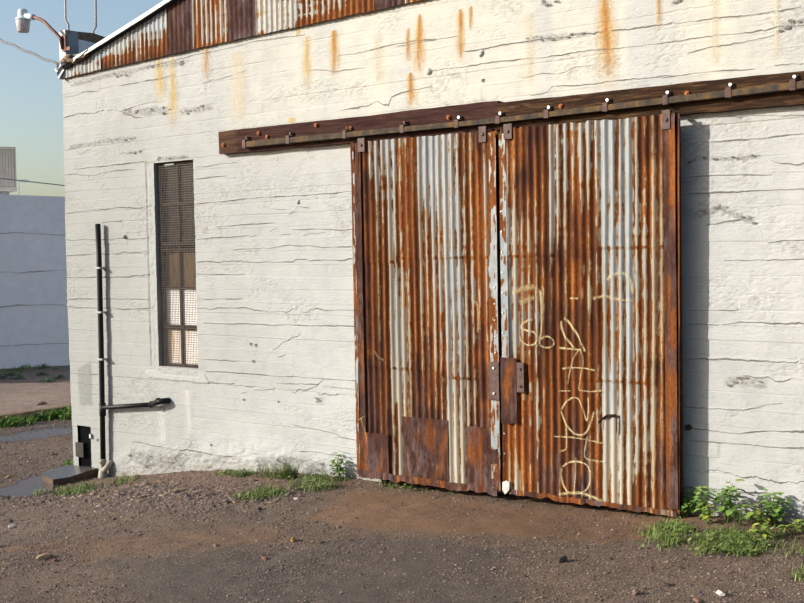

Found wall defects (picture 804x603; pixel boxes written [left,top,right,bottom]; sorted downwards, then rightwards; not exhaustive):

rust [407,15,422,59]
crack [308,5,804,111]
rust [600,0,613,59]
crack [686,307,804,325]
crack [686,356,804,382]
crack [684,402,804,448]
crack [683,467,804,500]